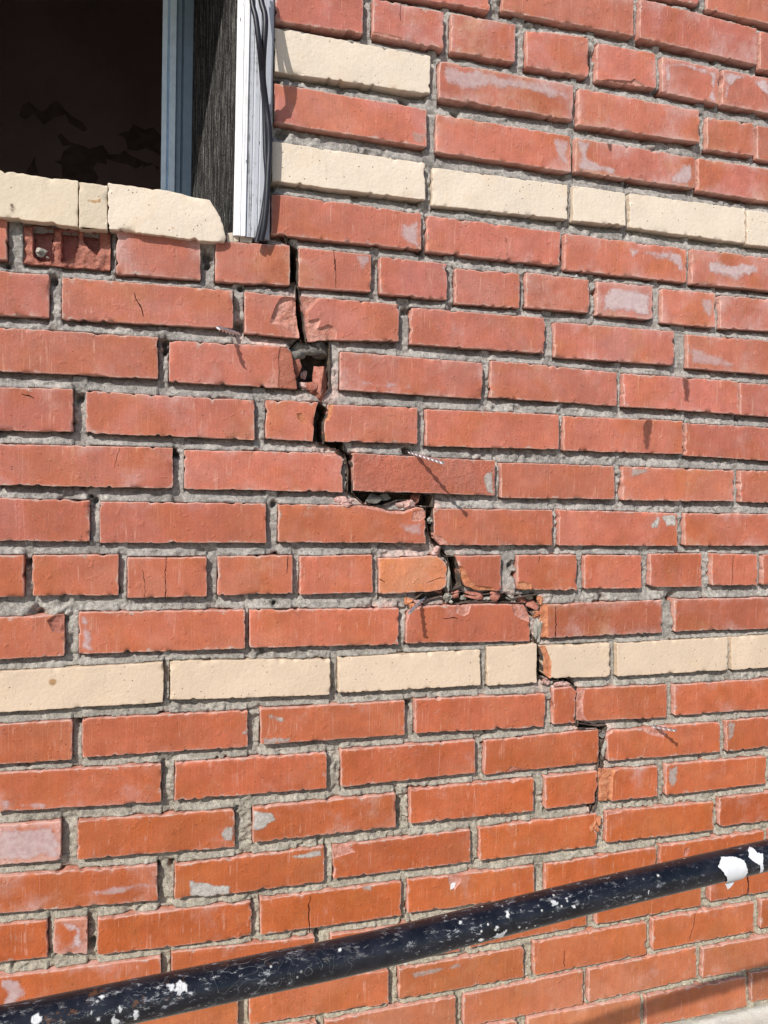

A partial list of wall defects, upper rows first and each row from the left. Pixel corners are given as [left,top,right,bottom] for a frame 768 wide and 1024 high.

crack [35,247,50,259]
crack [282,236,607,833]
spalling [459,566,494,591]
spalling [517,581,532,590]
spalling [455,605,471,616]